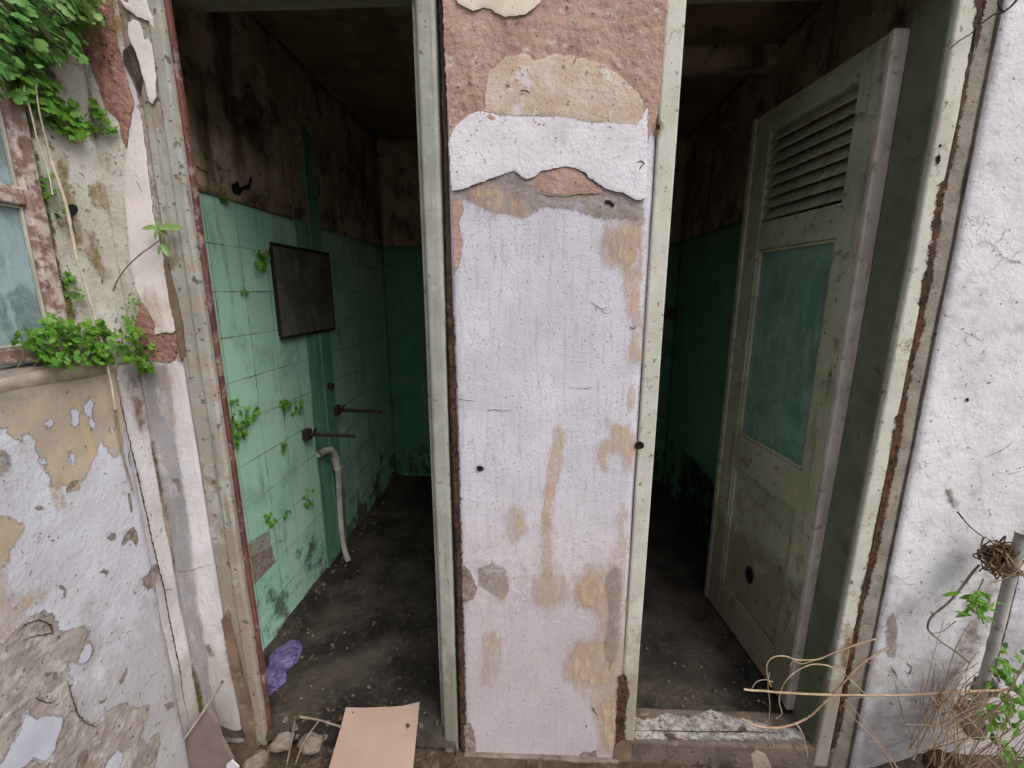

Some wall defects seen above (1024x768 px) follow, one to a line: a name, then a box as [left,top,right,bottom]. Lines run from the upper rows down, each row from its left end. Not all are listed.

flaking render [74,0,186,363]
flaking render [442,0,668,361]
peeling [0,515,25,569]
peeling [0,372,127,510]
peeling [0,610,162,768]
peeling [107,527,138,545]
peeling [142,564,158,589]
crack [115,374,210,740]
rust [446,315,467,752]
rust [830,0,988,751]